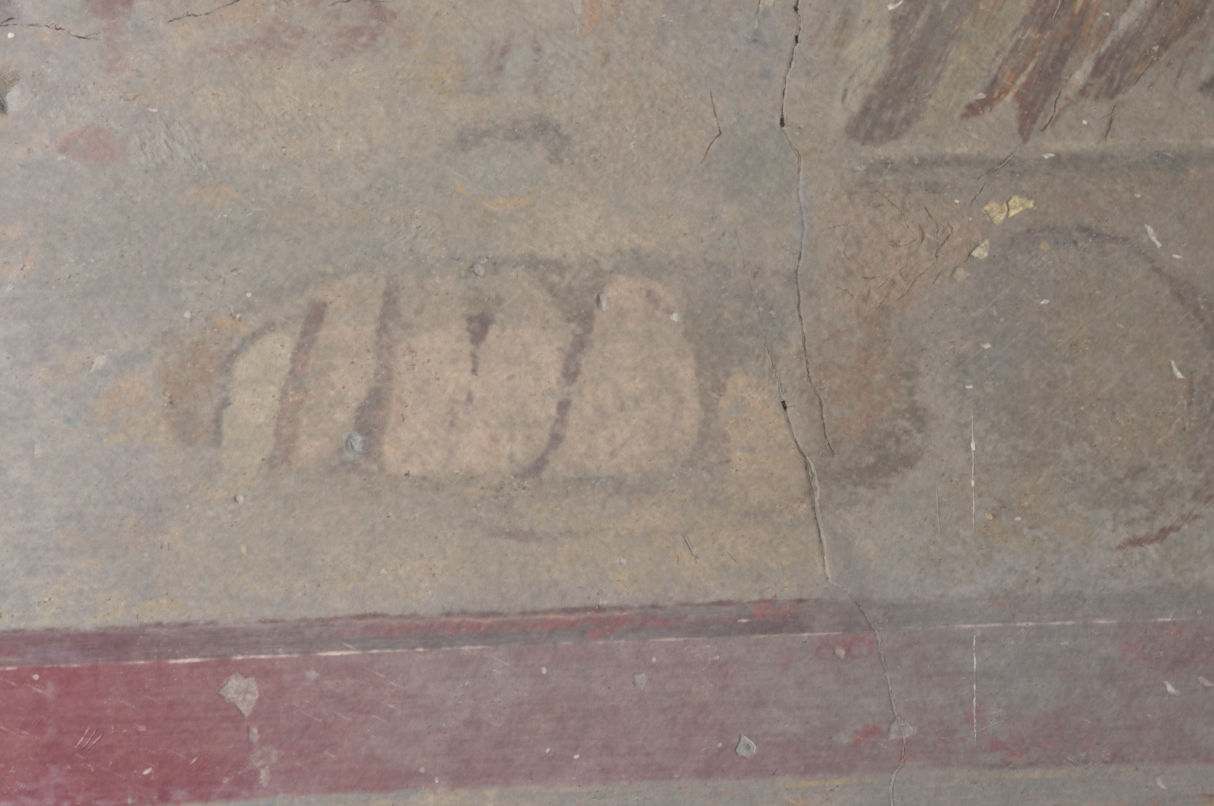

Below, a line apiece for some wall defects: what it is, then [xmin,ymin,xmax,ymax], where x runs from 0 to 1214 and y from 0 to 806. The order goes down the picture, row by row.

crack [165,0,240,24]
crack [328,0,394,8]
crack [0,17,102,41]
crack [753,0,908,806]
peeling [215,672,288,789]
spalling [733,732,756,759]